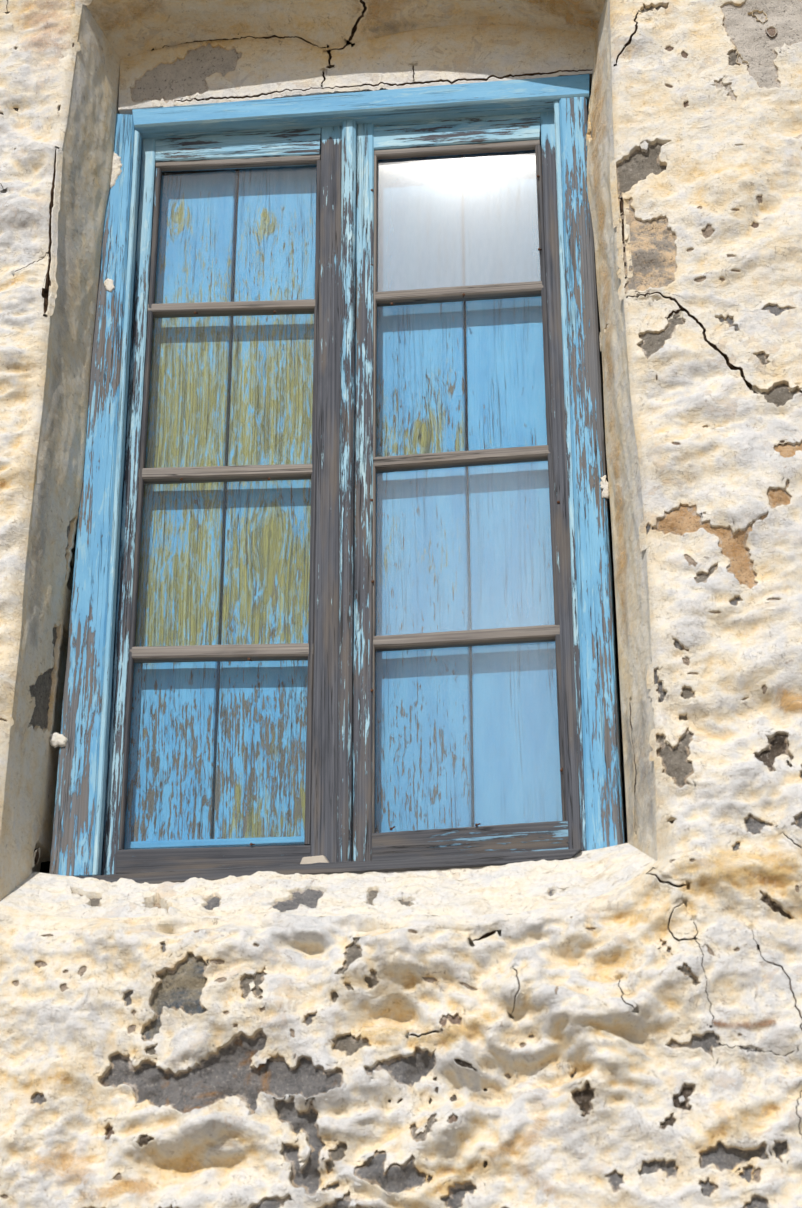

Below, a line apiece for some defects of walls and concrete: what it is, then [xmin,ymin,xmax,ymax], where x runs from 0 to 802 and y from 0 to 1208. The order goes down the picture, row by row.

crack [153,0,643,106]
spalling [703,0,802,106]
crack [14,148,63,316]
spalling [610,133,768,386]
crack [617,194,762,394]
spalling [708,298,802,415]
spalling [639,420,802,620]
spalling [647,631,704,831]
spalling [260,881,333,914]
crack [778,828,802,858]
spalling [90,929,572,1208]
crack [641,866,802,1150]